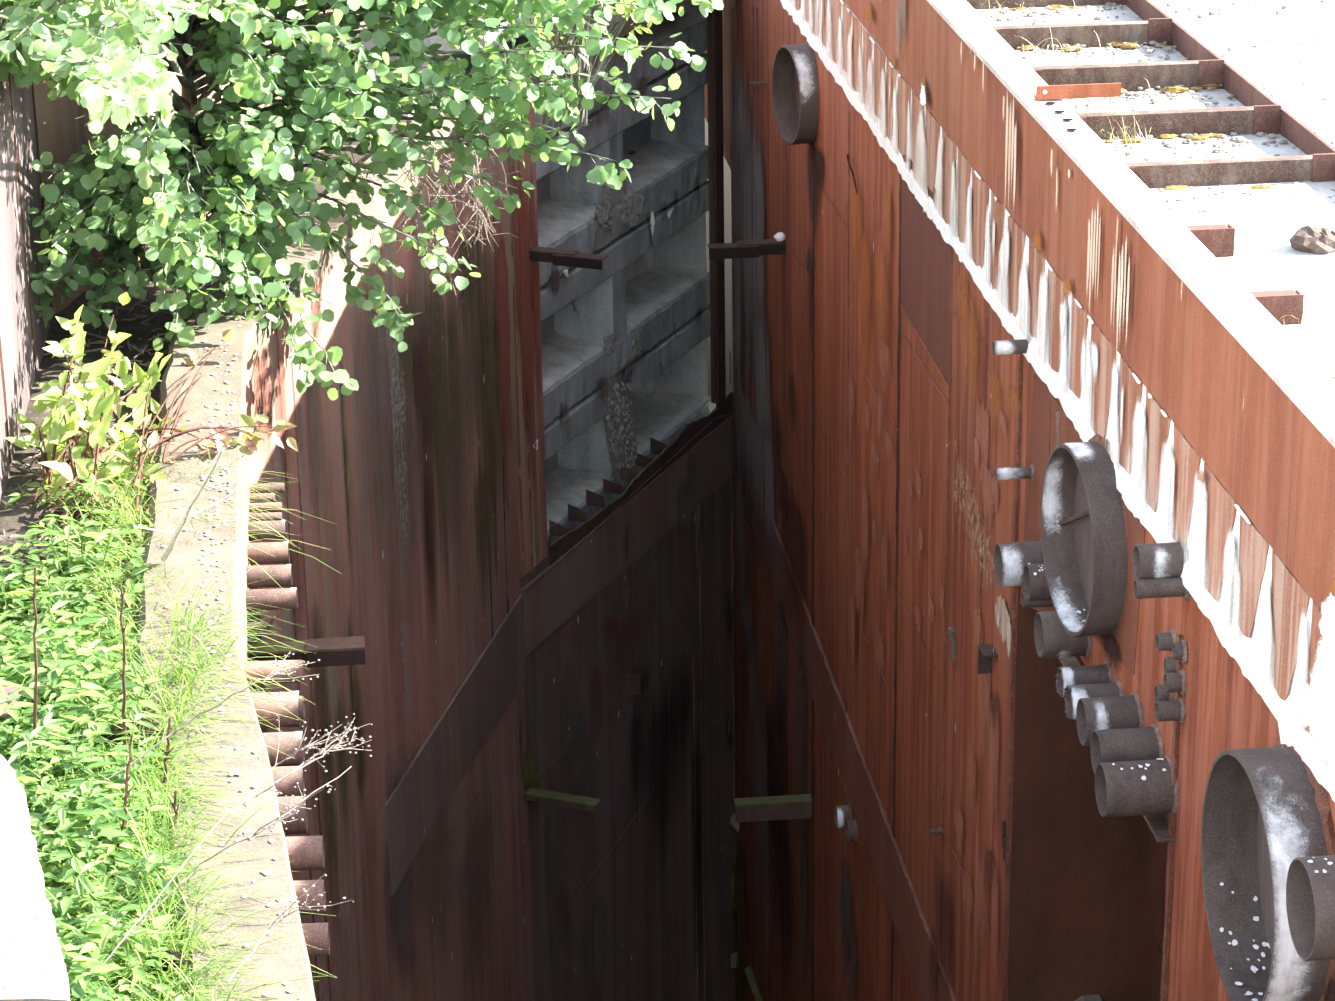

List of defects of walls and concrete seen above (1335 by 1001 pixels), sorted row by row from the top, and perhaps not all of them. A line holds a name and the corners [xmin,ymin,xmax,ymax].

rust [851,180,890,336]
damp [790,0,1240,640]
rust [258,355,288,466]
rust [414,322,436,588]
rust [292,541,303,630]
damp [1097,634,1117,664]
damp [1252,580,1273,690]
damp [1291,593,1335,778]